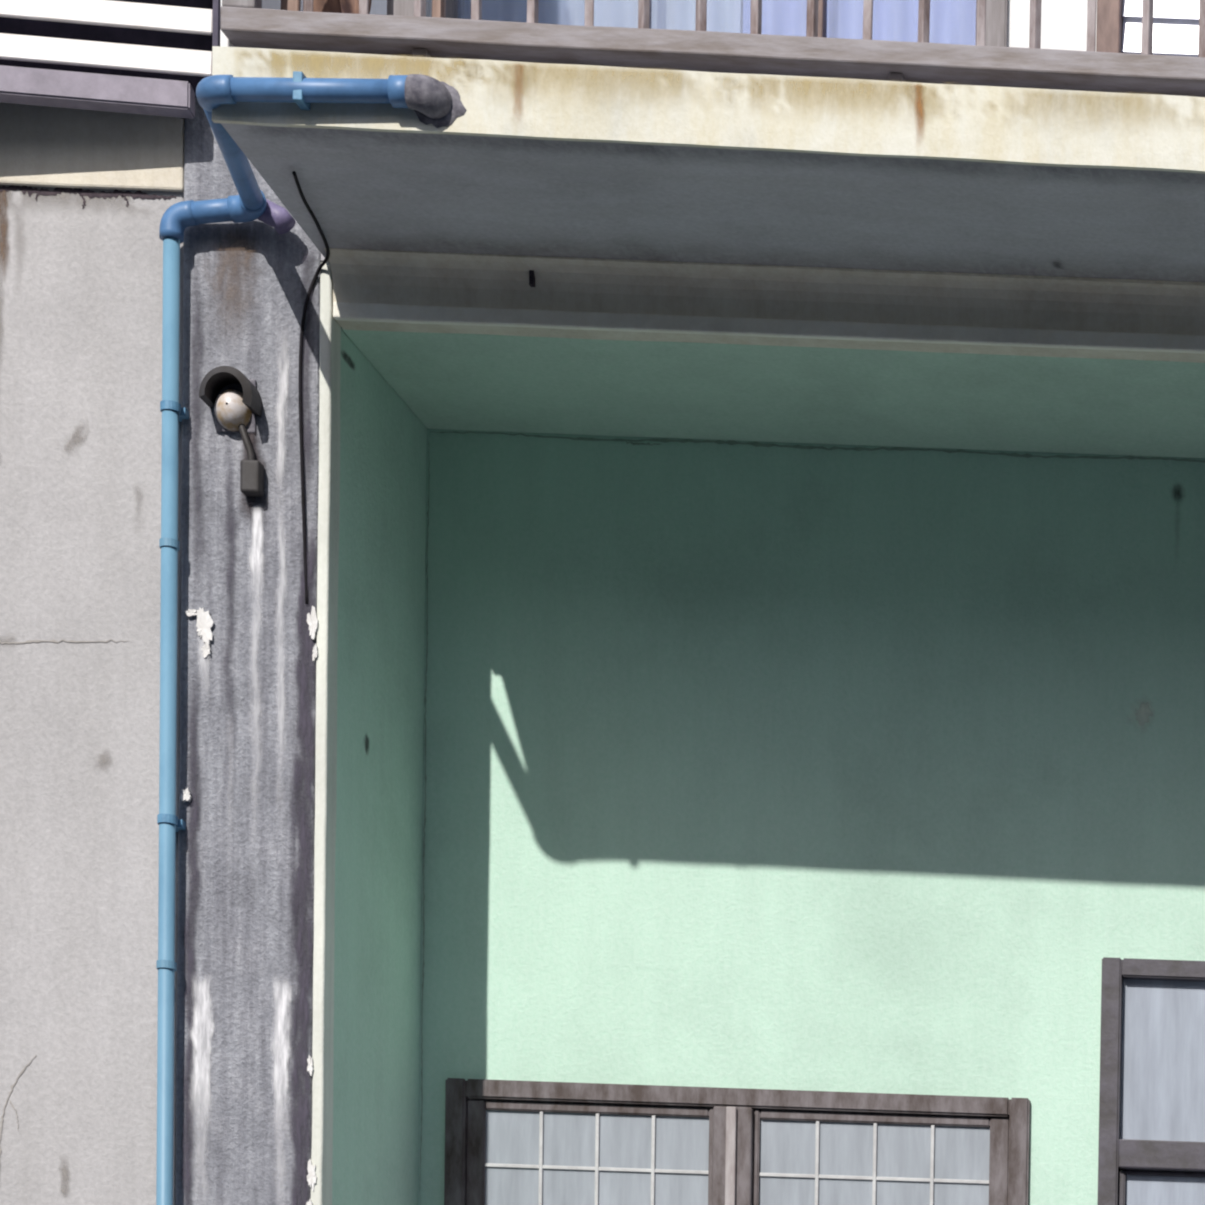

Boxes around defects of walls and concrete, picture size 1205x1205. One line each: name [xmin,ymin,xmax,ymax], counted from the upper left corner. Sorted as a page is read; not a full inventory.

water stain [0,190,8,265]
water stain [242,362,288,471]
water stain [241,494,265,584]
peeling [185,608,214,667]
peeling [307,606,318,662]
water stain [273,542,316,1205]
water stain [182,718,214,1205]